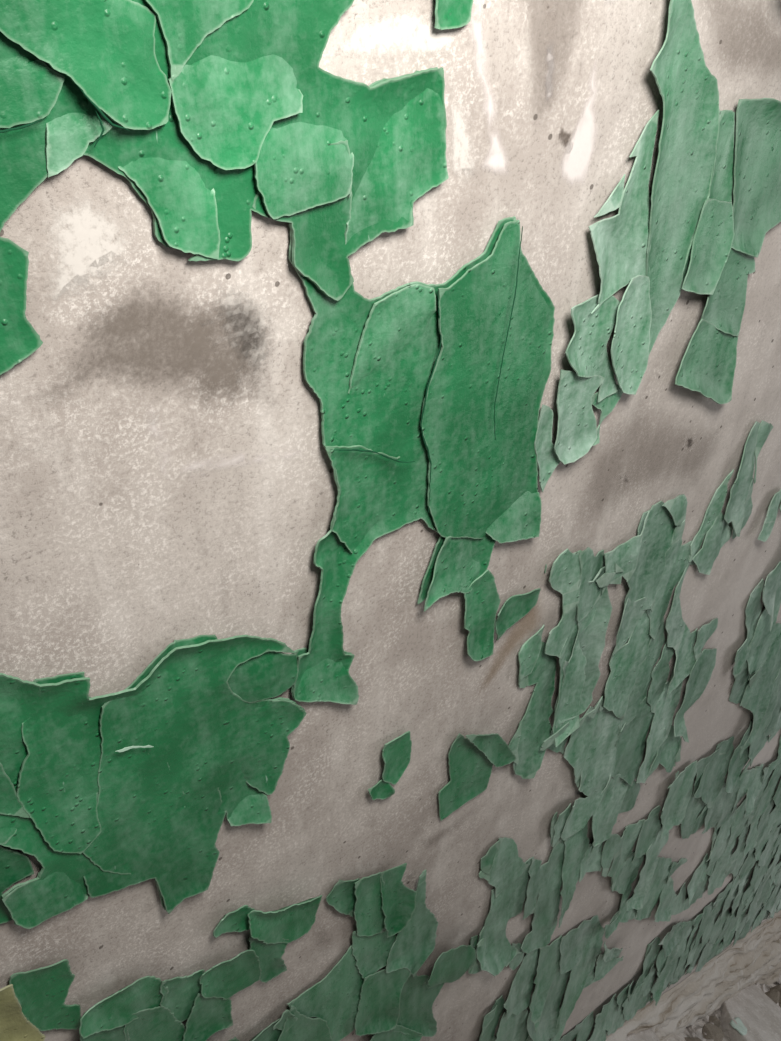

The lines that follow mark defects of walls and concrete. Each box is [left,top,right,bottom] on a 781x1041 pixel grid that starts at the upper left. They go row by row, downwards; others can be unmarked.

damp [52,205,124,295]
damp [85,293,266,394]
peeling [0,0,555,929]
peeling [534,0,781,492]
peeling [0,420,781,1041]